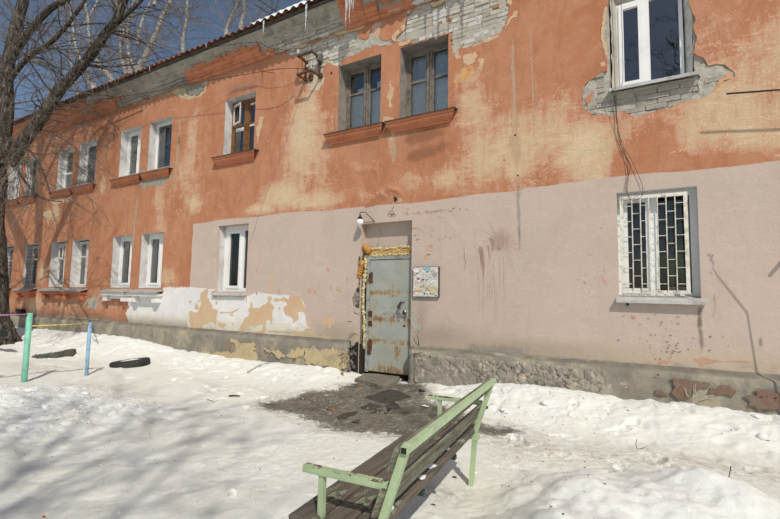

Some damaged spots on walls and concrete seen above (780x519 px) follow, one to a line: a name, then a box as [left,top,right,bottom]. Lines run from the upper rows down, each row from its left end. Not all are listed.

spalling [281,0,518,92]
spalling [581,0,735,116]
peeling [189,274,357,372]
peeling [655,378,780,411]